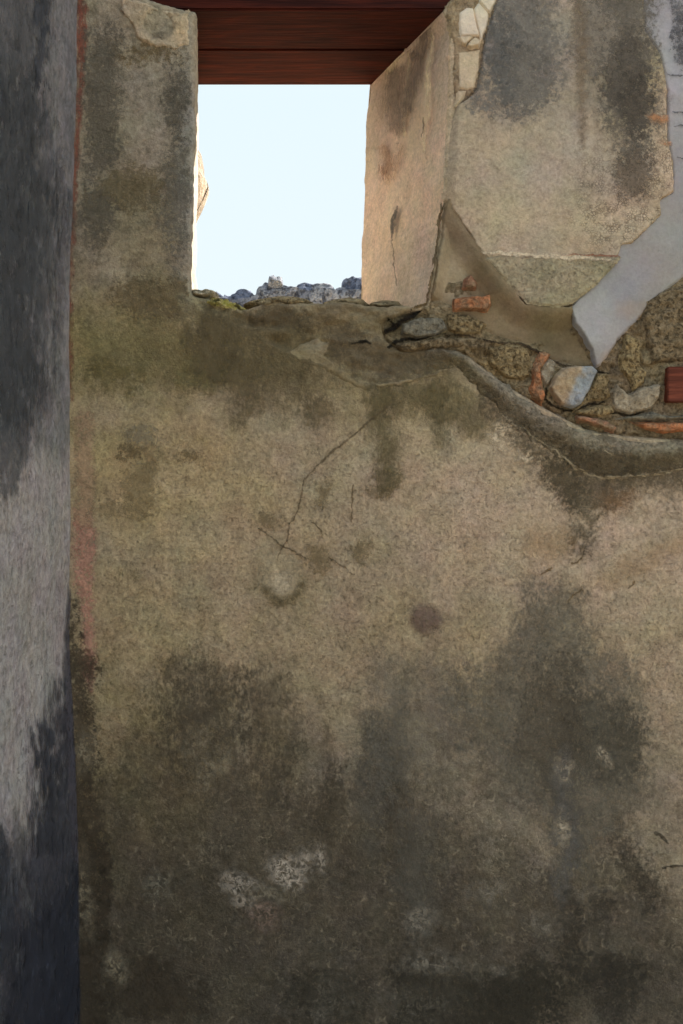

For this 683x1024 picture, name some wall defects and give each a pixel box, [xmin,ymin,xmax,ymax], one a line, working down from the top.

peeling [445,0,497,107]
damp [468,0,683,201]
damp [0,0,192,499]
crack [258,406,387,570]
damp [188,307,683,555]
spalling [381,207,683,440]
damp [0,590,209,1024]
efflorescence [228,851,325,929]
damp [392,582,663,1024]